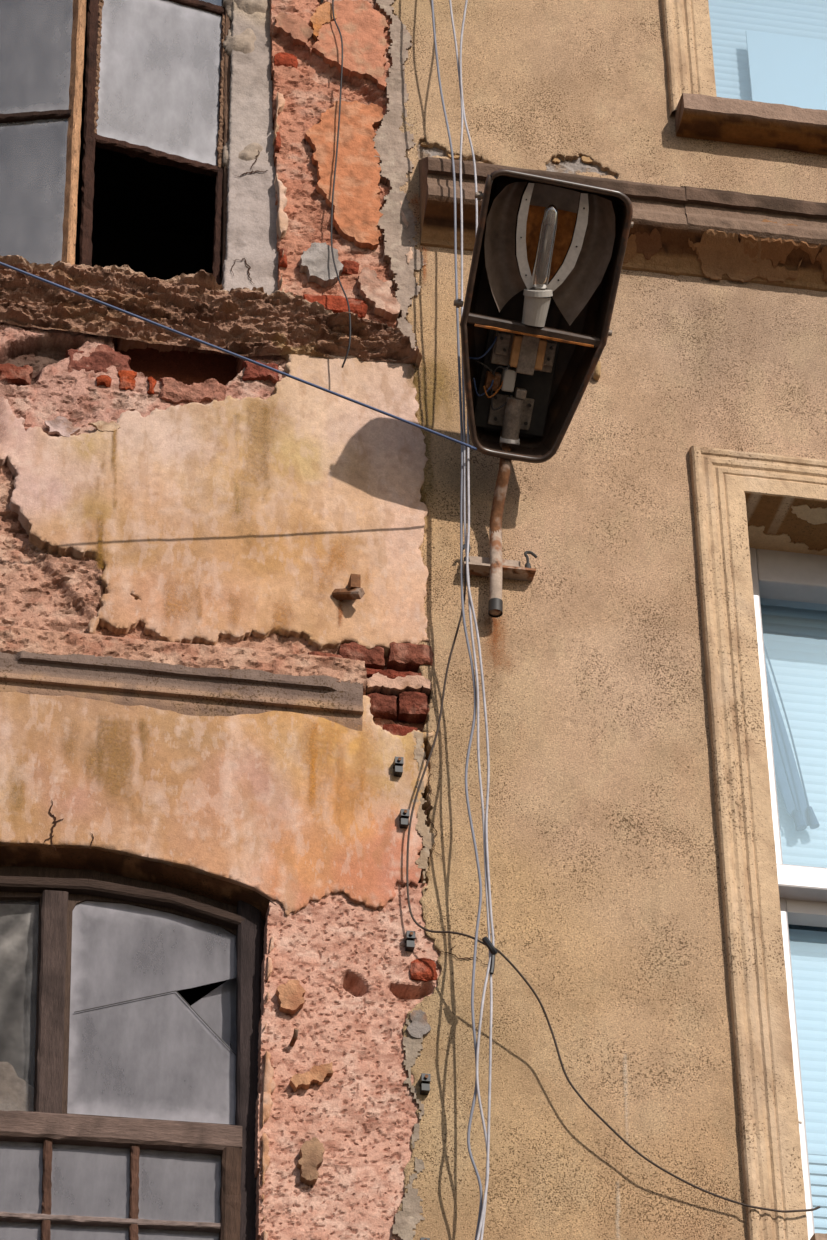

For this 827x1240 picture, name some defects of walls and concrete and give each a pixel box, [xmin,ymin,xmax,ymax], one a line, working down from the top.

spalling [270,0,401,328]
peeling [546,156,618,179]
peeling [688,219,827,284]
spalling [0,322,288,437]
peeling [748,525,827,556]
peeling [791,504,827,524]
spalling [0,462,434,736]
spalling [254,882,441,1240]